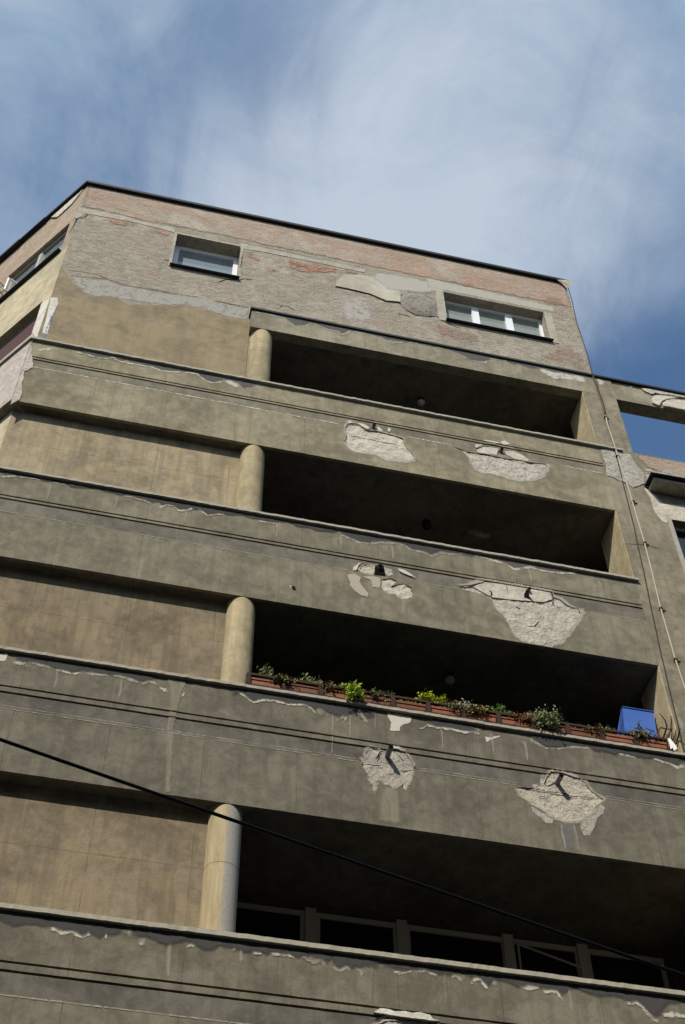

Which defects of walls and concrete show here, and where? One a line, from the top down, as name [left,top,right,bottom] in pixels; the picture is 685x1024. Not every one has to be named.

flaking render [72,186,571,320]
flaking render [641,388,685,412]
spalling [343,420,416,463]
spalling [457,440,551,489]
spalling [601,449,685,523]
flaking render [347,562,415,599]
spalling [459,578,585,647]
peeling [388,713,411,731]
spalling [360,745,415,822]
spalling [516,769,606,847]